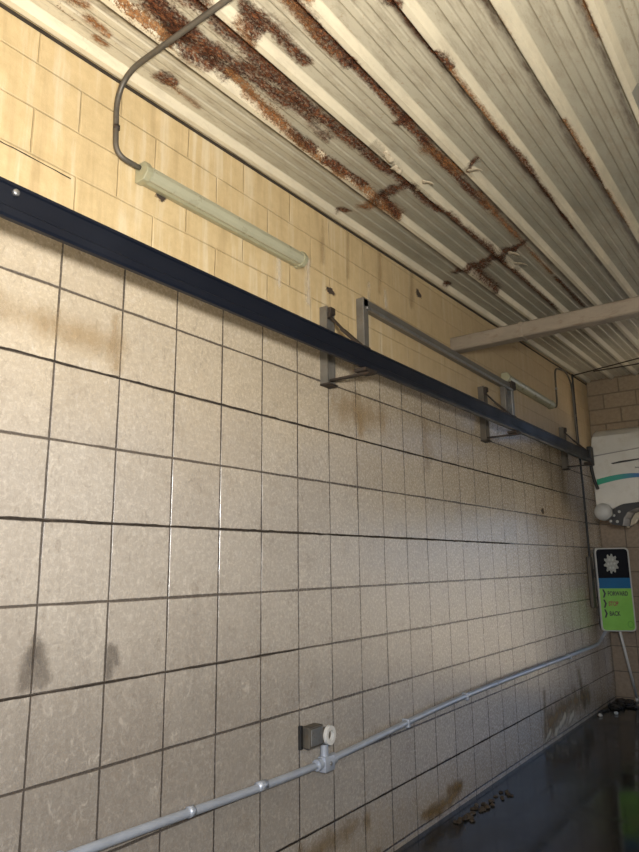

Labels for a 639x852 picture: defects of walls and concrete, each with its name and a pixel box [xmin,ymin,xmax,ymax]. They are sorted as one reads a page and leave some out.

rust [69,0,111,46]
rust [114,0,585,310]